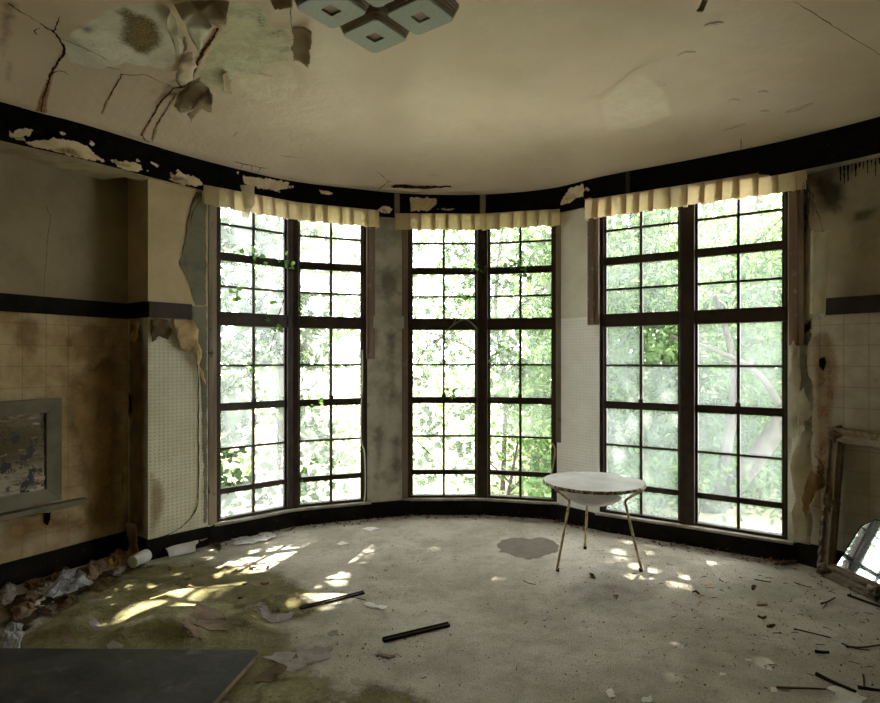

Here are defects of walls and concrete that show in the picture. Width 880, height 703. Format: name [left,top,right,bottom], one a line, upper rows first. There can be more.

crack [8,3,219,143]
mould [122,11,159,52]
peeling [51,0,312,122]
peeling [9,128,159,172]
peeling [410,197,453,212]
peeling [560,184,592,205]
damp [817,157,880,209]
damp [70,321,144,534]
peeling [148,169,208,540]
peeling [800,320,813,455]